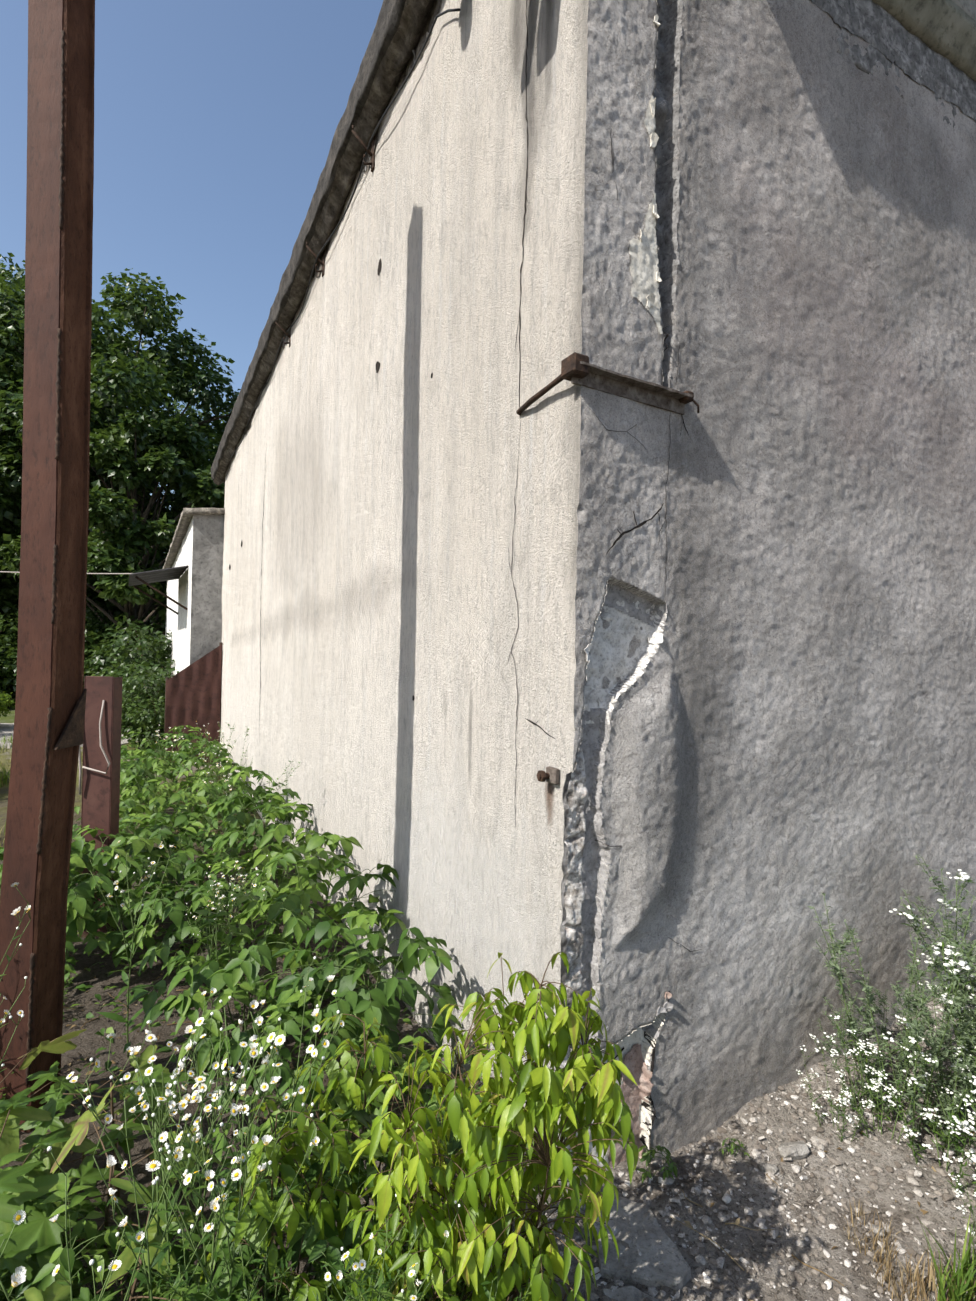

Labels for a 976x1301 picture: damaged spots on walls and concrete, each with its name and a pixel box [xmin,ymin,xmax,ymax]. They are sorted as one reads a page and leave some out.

crack [507,0,555,826]
crack [591,0,689,595]
peeling [629,193,663,334]
peeling [644,96,656,137]
flaking render [556,578,673,1188]